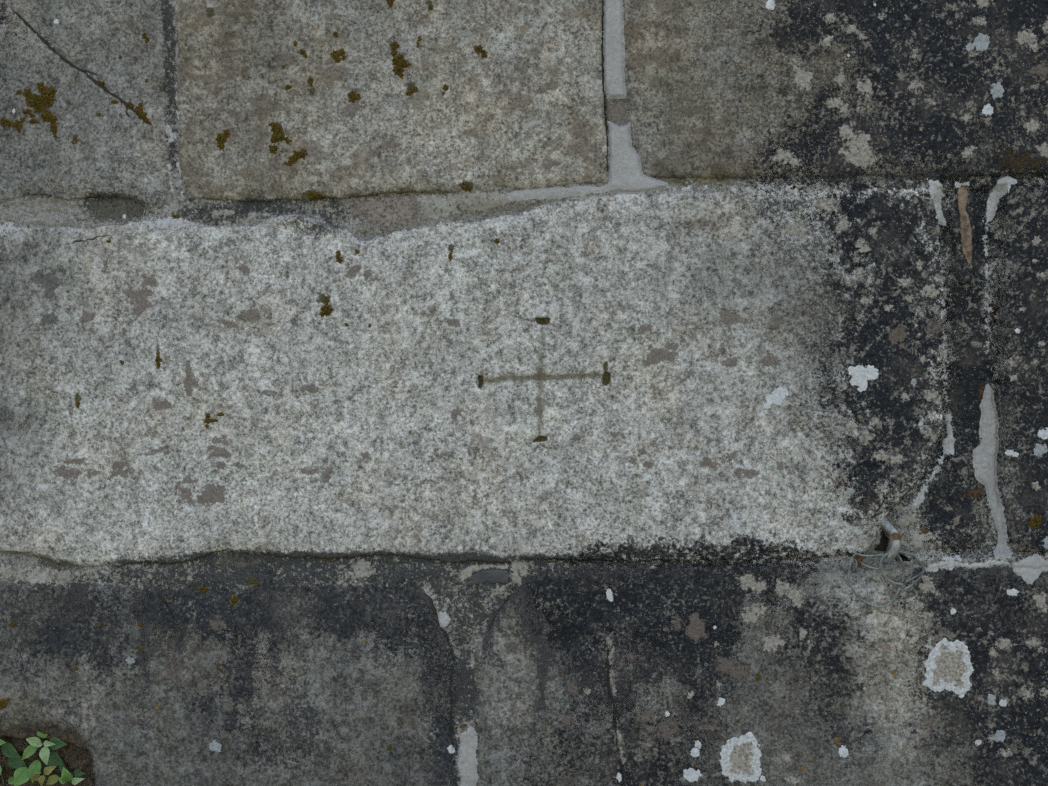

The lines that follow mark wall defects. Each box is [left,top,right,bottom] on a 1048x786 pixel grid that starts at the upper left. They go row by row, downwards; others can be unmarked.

crack [10,7,150,124]
damp [745,0,1048,559]
damp [2,568,460,786]
damp [513,532,877,786]
damp [897,551,1048,786]